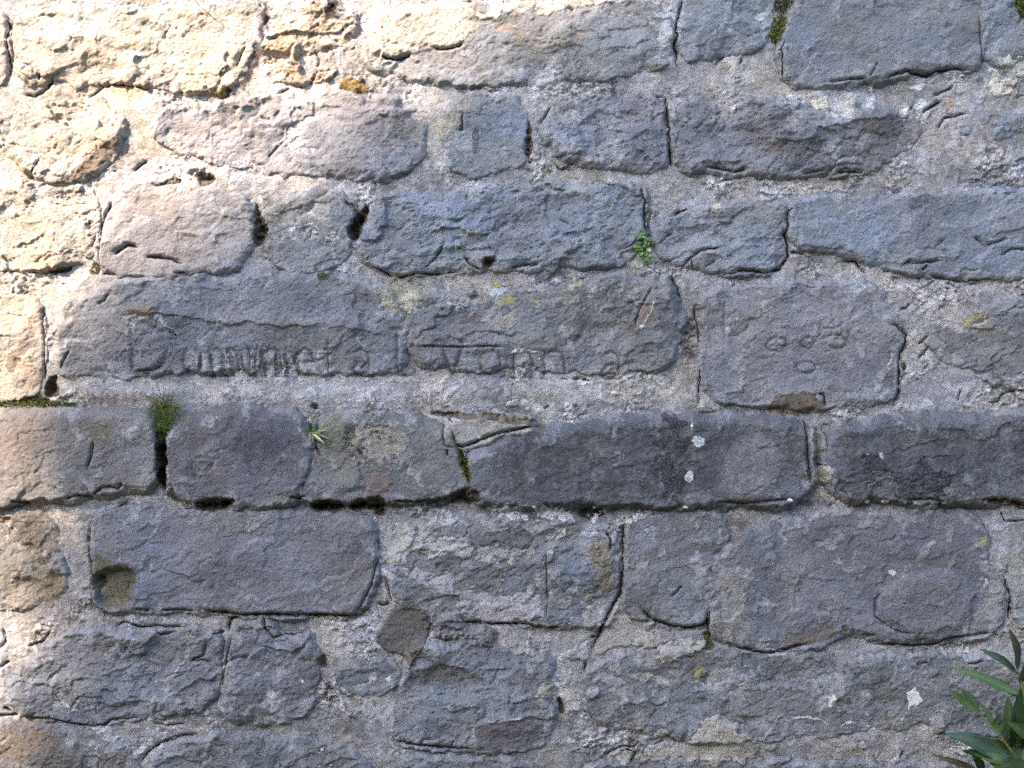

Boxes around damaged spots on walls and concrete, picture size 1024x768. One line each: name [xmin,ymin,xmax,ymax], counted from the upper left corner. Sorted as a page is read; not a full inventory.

crack [443,406,549,455]
crack [583,524,625,671]